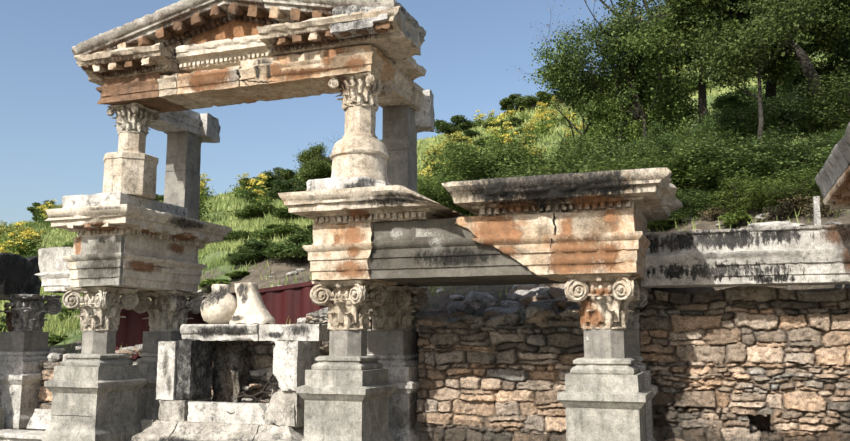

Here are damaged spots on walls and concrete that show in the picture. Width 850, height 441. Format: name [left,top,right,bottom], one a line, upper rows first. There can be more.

leakage [449,170,657,209]
crack [548,212,557,271]
leakage [643,227,820,283]